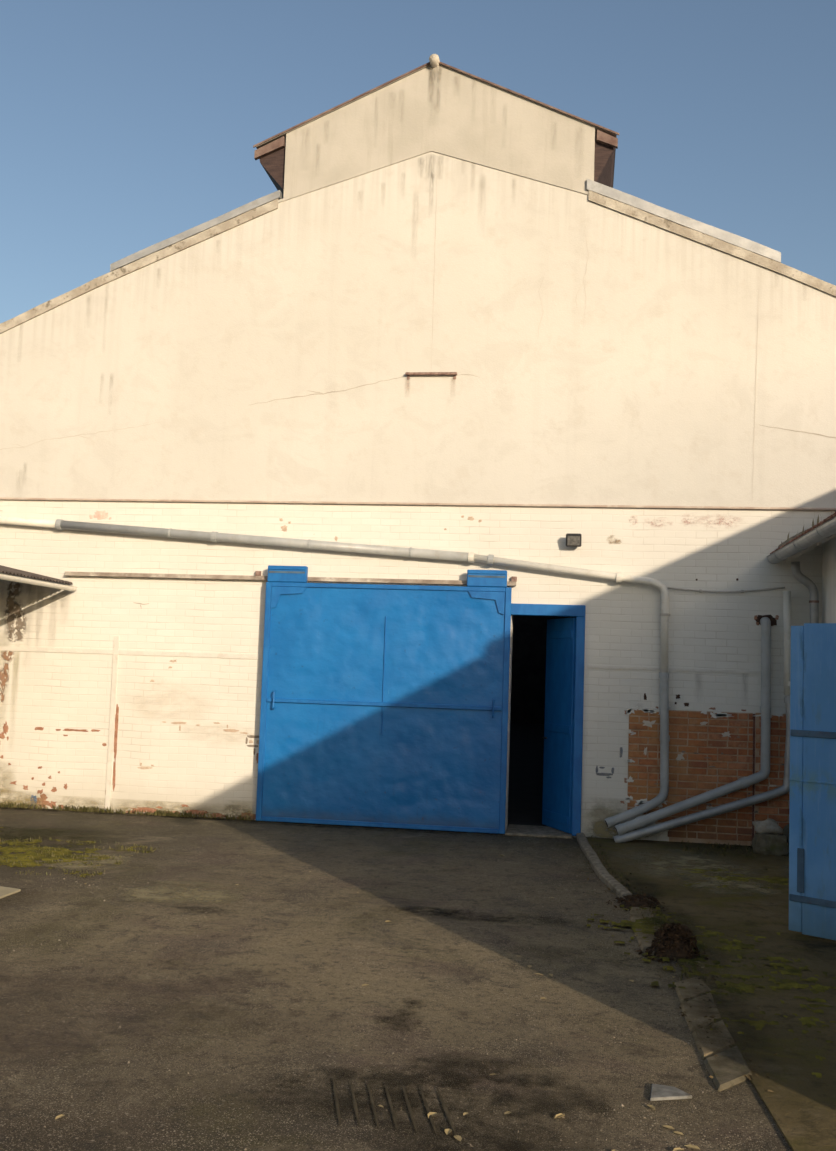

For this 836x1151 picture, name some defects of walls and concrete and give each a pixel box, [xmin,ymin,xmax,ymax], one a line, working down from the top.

crack [252,377,401,405]
crack [752,292,836,498]
spalling [10,766,68,809]
peeling [34,704,119,795]
spalling [214,722,259,763]
flaking render [620,693,790,846]